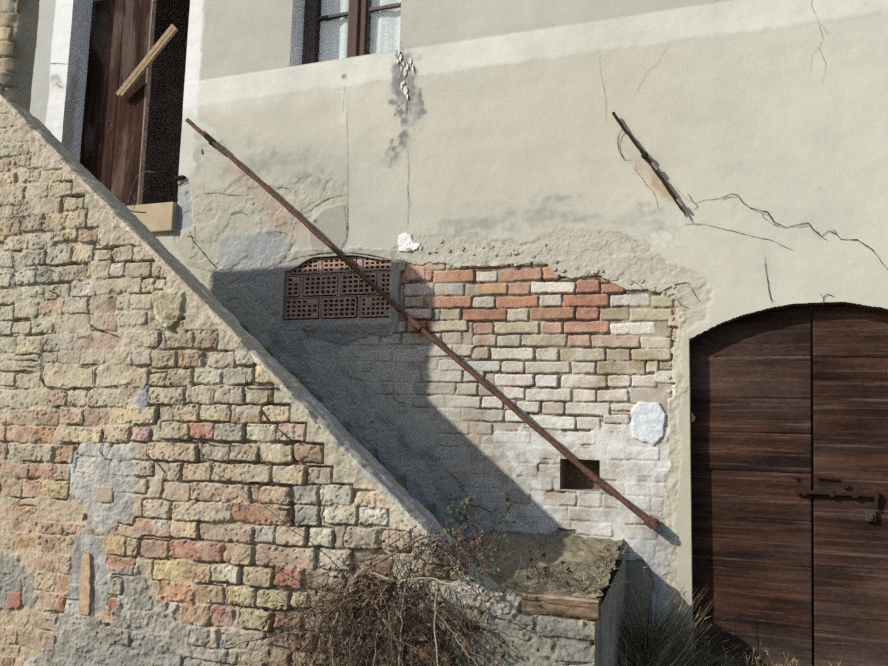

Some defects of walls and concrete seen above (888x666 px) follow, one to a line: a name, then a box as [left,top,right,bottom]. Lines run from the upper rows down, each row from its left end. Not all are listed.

leakage [375,40,430,174]
rust [223,158,323,248]
rust [626,151,680,206]
crack [688,193,888,270]
spalling [337,232,680,648]